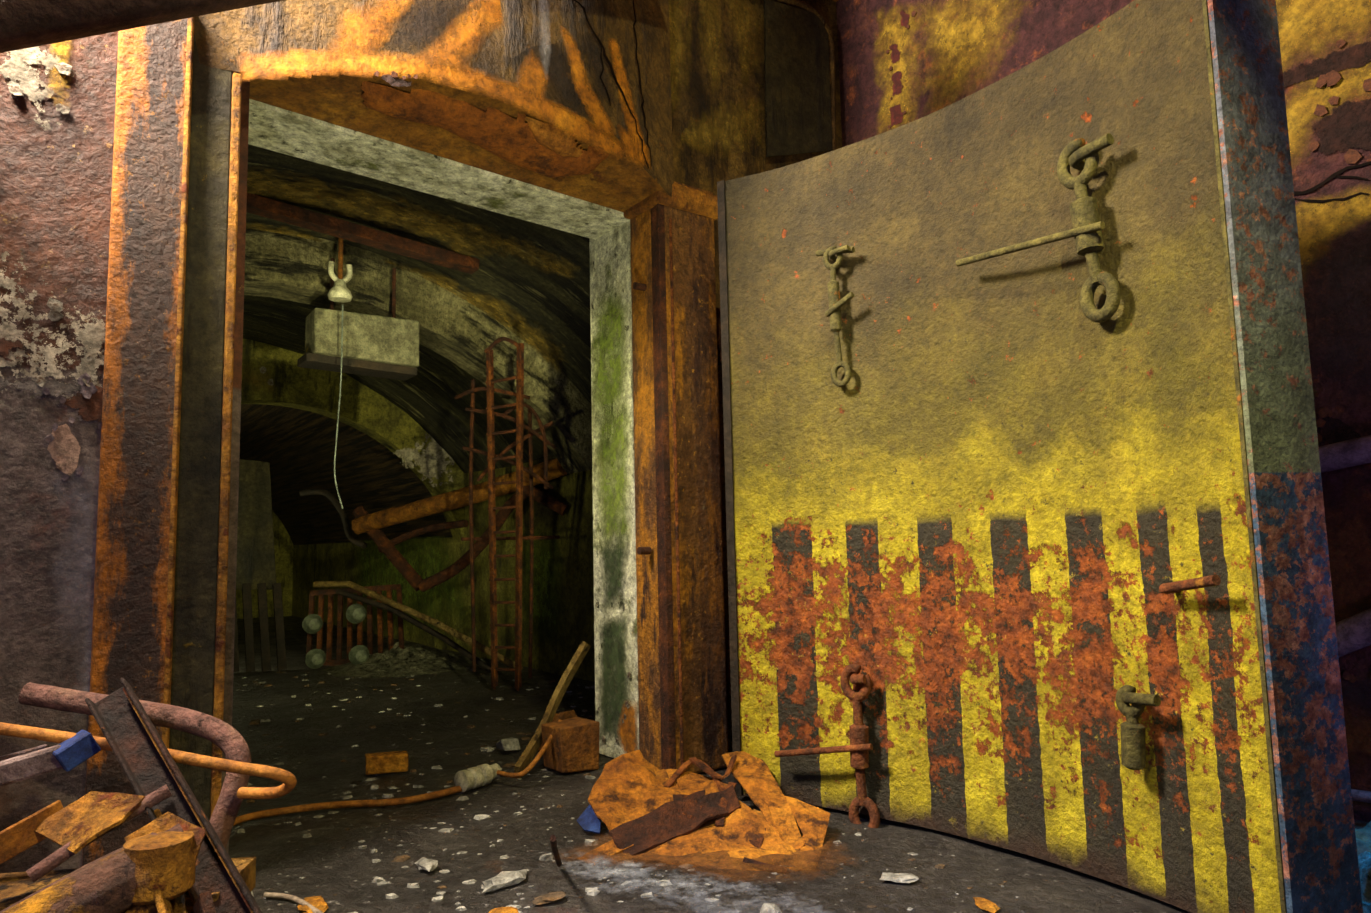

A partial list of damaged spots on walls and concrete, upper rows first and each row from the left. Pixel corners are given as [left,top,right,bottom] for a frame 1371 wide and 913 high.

peeling [0,40,87,129]
crack [574,0,652,168]
crack [1294,161,1371,203]
peeling [0,236,106,481]